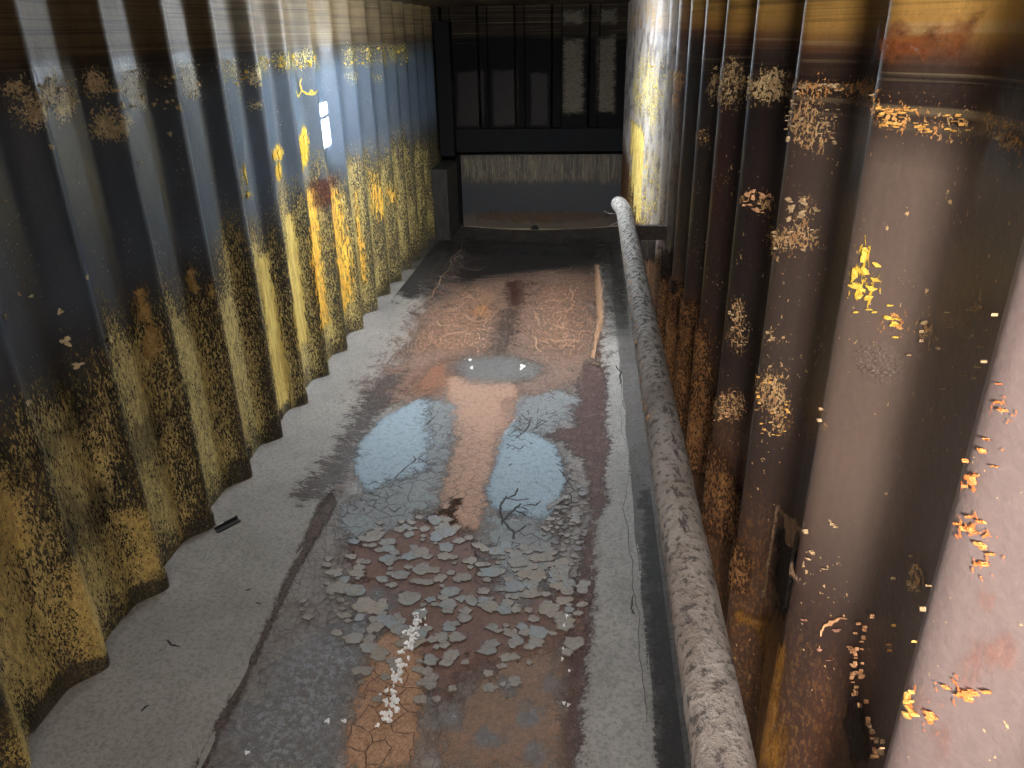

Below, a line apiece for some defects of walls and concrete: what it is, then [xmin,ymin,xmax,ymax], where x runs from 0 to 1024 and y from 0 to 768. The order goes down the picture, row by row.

rust [256,171,399,411]
peeling [847,235,998,350]
rust [1,668,32,768]
rust [0,461,114,675]
rust [108,493,165,601]
rust [196,489,337,768]
water stain [289,367,461,548]
crack [345,665,421,768]
water stain [473,390,584,608]
rust [618,116,802,768]